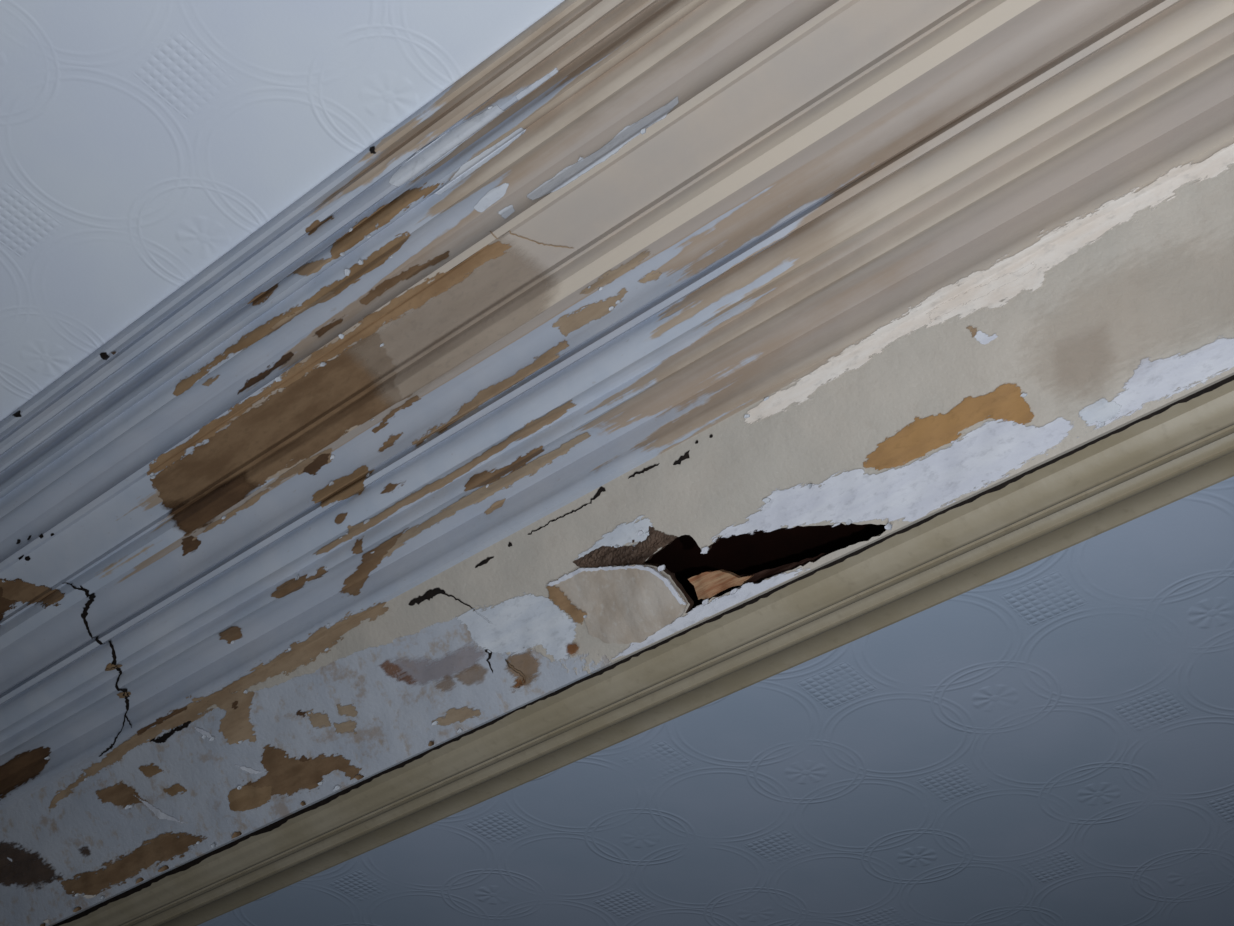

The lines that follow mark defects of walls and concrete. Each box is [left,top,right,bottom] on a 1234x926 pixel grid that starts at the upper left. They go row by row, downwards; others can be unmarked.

peeling [516,68,558,100]
peeling [527,96,678,200]
peeling [173,105,526,396]
crack [490,231,574,249]
spalling [966,326,998,345]
peeling [147,241,662,556]
crack [16,533,55,561]
peeling [456,336,1234,661]
peeling [0,578,65,621]
peeling [48,400,591,899]
crack [40,375,1234,926]
peeling [0,746,51,799]